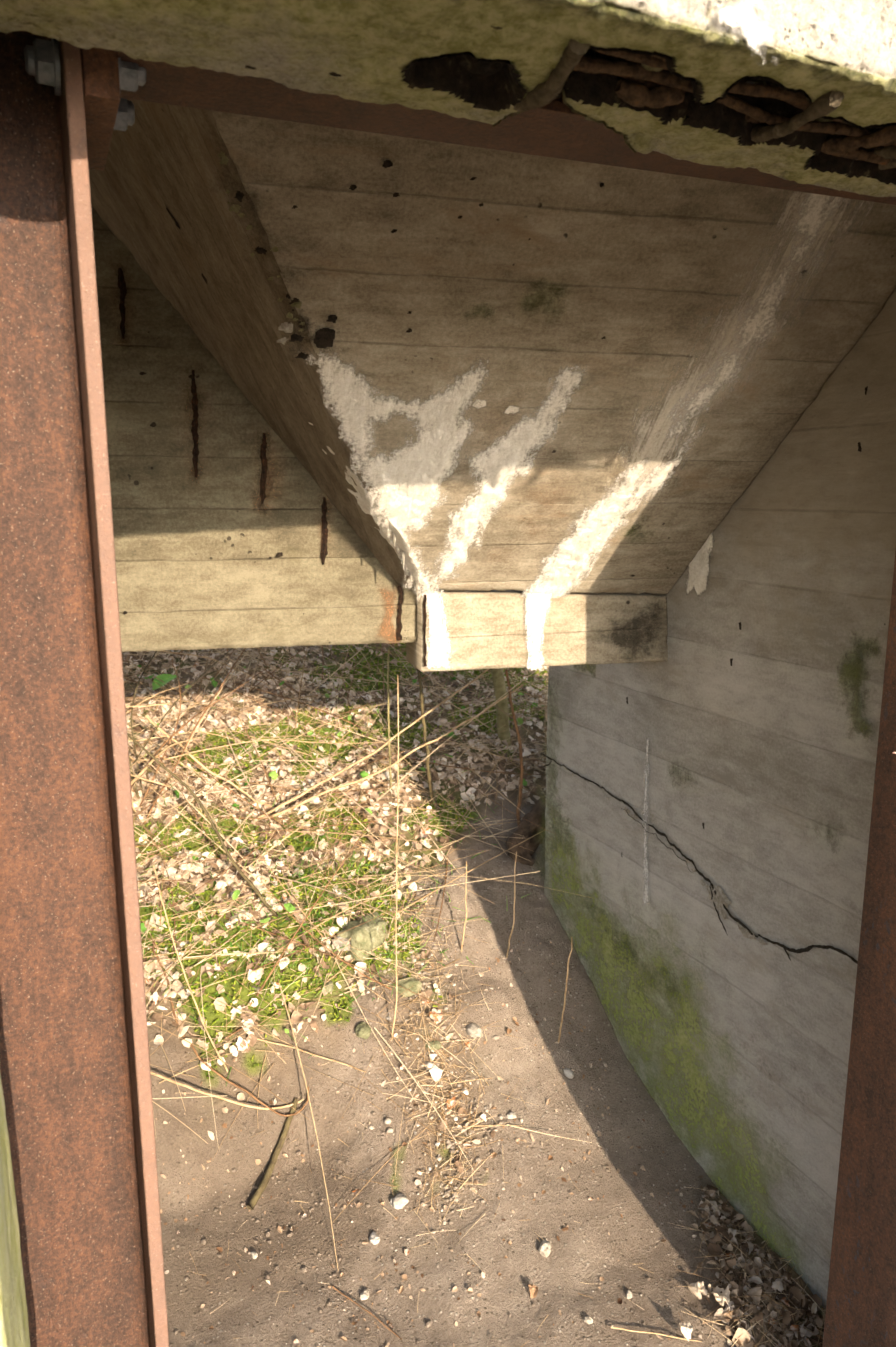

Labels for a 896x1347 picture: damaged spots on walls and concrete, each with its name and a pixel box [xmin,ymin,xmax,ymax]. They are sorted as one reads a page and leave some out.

spalling [400,39,896,185]
rust [188,370,201,480]
rust [258,433,268,509]
rust [320,497,328,565]
damp [309,352,582,669]
damp [522,191,874,670]
crack [541,753,858,964]